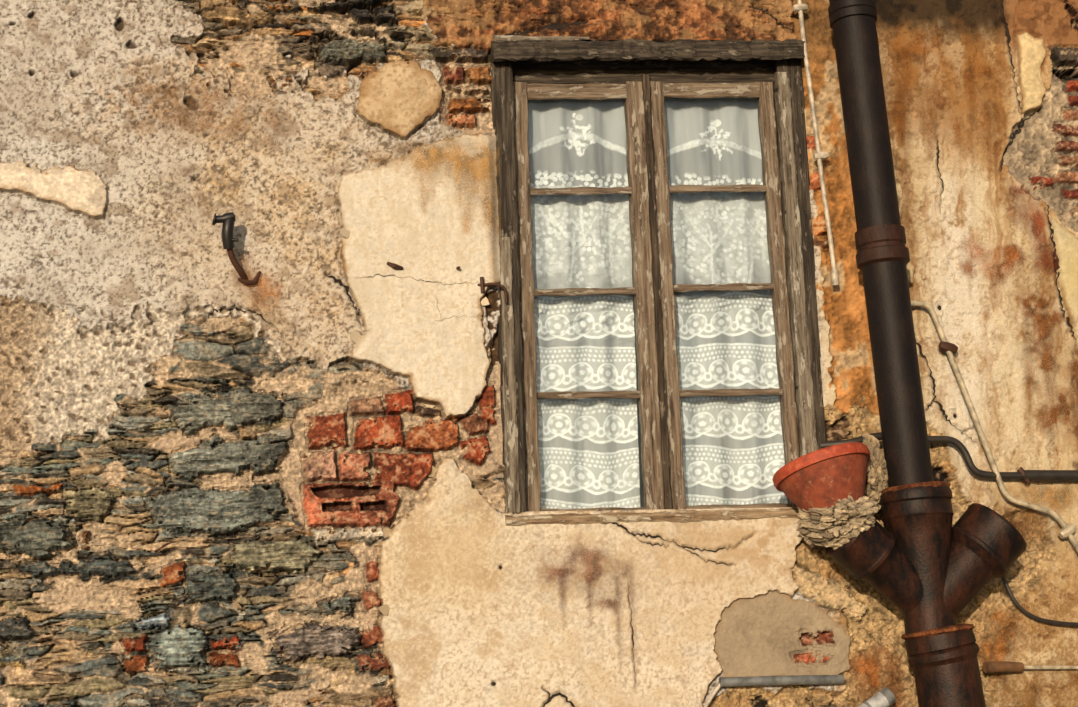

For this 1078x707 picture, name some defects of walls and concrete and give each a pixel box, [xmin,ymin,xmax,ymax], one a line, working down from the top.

spalling [1003,32,1078,232]
corrosion [999,245,1024,279]
corrosion [1020,210,1054,271]
crack [326,274,472,319]
spalling [0,0,506,707]
corrosion [881,481,951,494]
crack [612,523,753,565]
leakage [550,549,602,591]
flaking render [378,458,919,707]
spalling [956,501,1057,707]
corrosion [901,623,975,640]
crack [543,689,575,707]